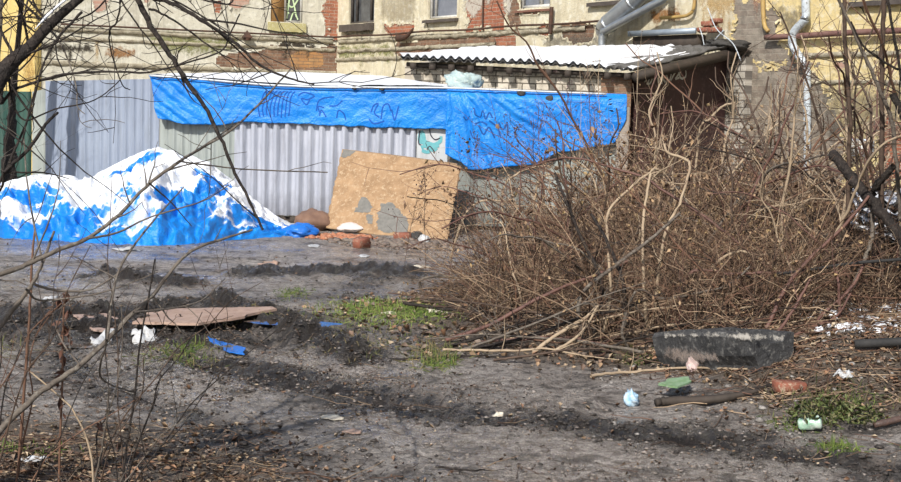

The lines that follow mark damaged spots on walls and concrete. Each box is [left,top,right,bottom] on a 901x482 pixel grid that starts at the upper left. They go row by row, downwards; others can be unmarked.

peeling [212,0,338,73]
peeling [381,0,597,56]
peeling [872,109,901,181]